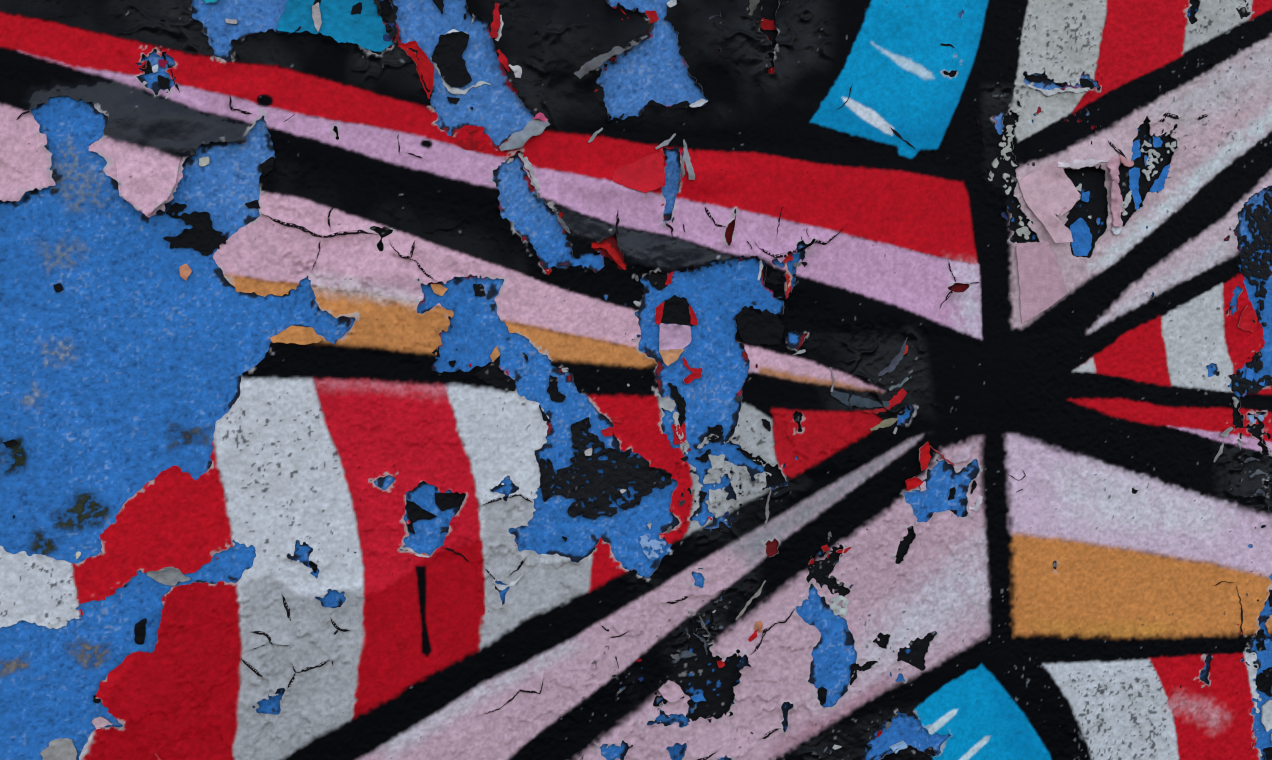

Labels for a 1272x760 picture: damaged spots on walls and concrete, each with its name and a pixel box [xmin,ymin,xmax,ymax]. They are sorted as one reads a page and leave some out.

peeling [0,96,356,563]
peeling [191,0,816,578]
peeling [985,71,1178,324]
peeling [1206,186,1272,528]
peeling [895,442,983,564]
peeling [0,540,256,760]
crack [241,595,350,688]
peeling [315,589,346,608]
peeling [647,590,763,727]
peeling [796,532,937,708]
peeling [861,711,950,760]
peeling [1237,571,1272,760]